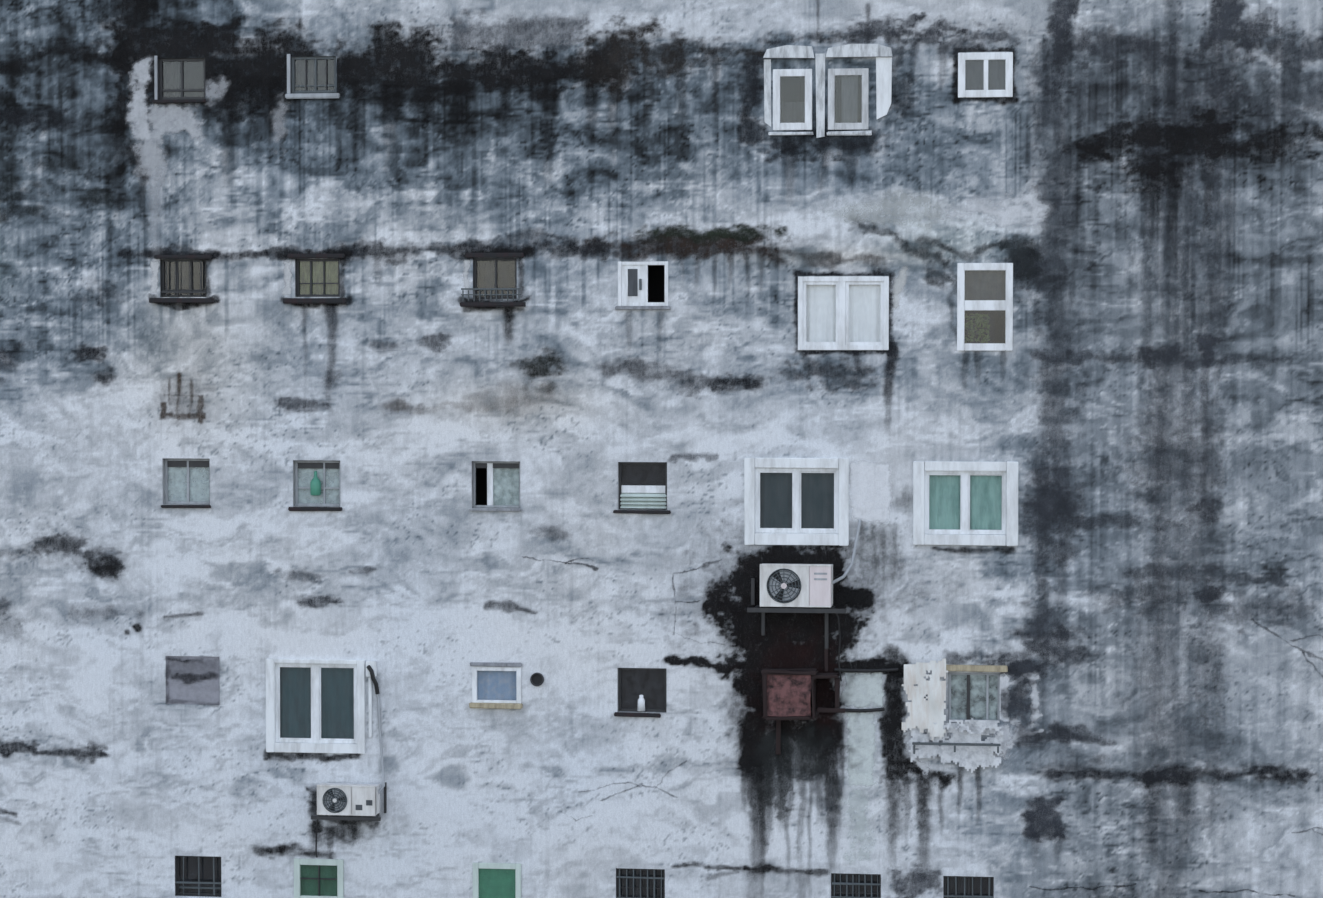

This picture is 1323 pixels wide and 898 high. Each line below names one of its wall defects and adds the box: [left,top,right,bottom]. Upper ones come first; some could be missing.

water stain [0,0,876,197]
water stain [809,10,1018,111]
water stain [323,233,609,262]
water stain [852,0,1323,567]
water stain [33,534,123,577]
water stain [0,741,107,762]
flaking render [904,731,929,773]
flaking render [992,673,1044,757]
water stain [946,608,1096,747]
water stain [1021,765,1312,842]
water stain [255,843,333,859]
water stain [674,863,828,875]